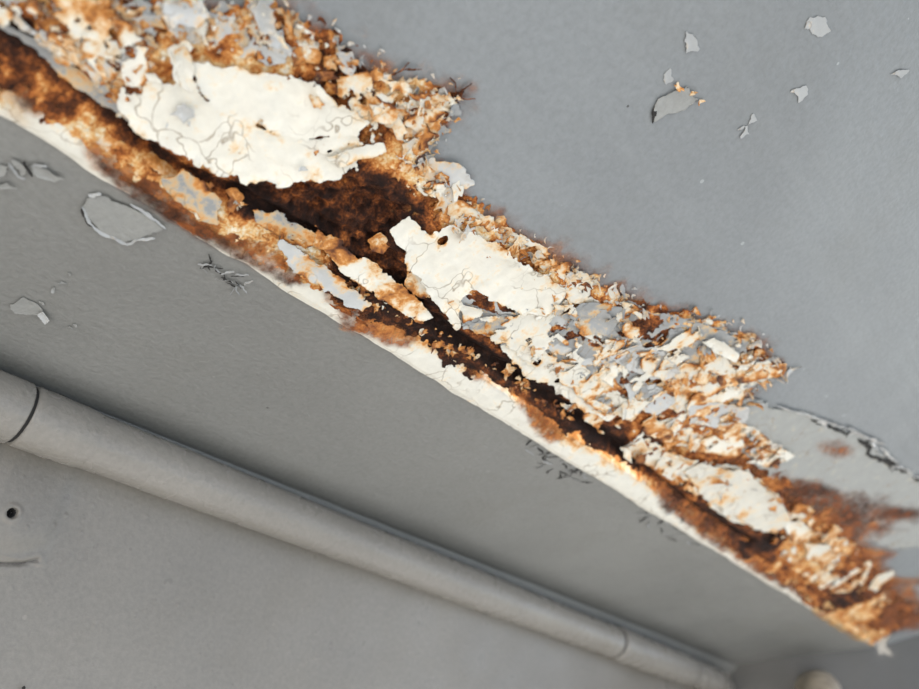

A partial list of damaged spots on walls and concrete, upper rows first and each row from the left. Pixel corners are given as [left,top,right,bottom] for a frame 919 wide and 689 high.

corrosion [104,0,176,95]
peeling [0,0,387,190]
corrosion [190,0,465,127]
peeling [10,297,49,324]
peeling [81,192,166,246]
corrosion [0,28,333,291]
peeling [225,187,248,213]
corrosion [286,241,358,288]
corrosion [342,117,450,245]
corrosion [458,194,694,357]
peeling [310,30,919,593]
corrosion [325,290,919,646]